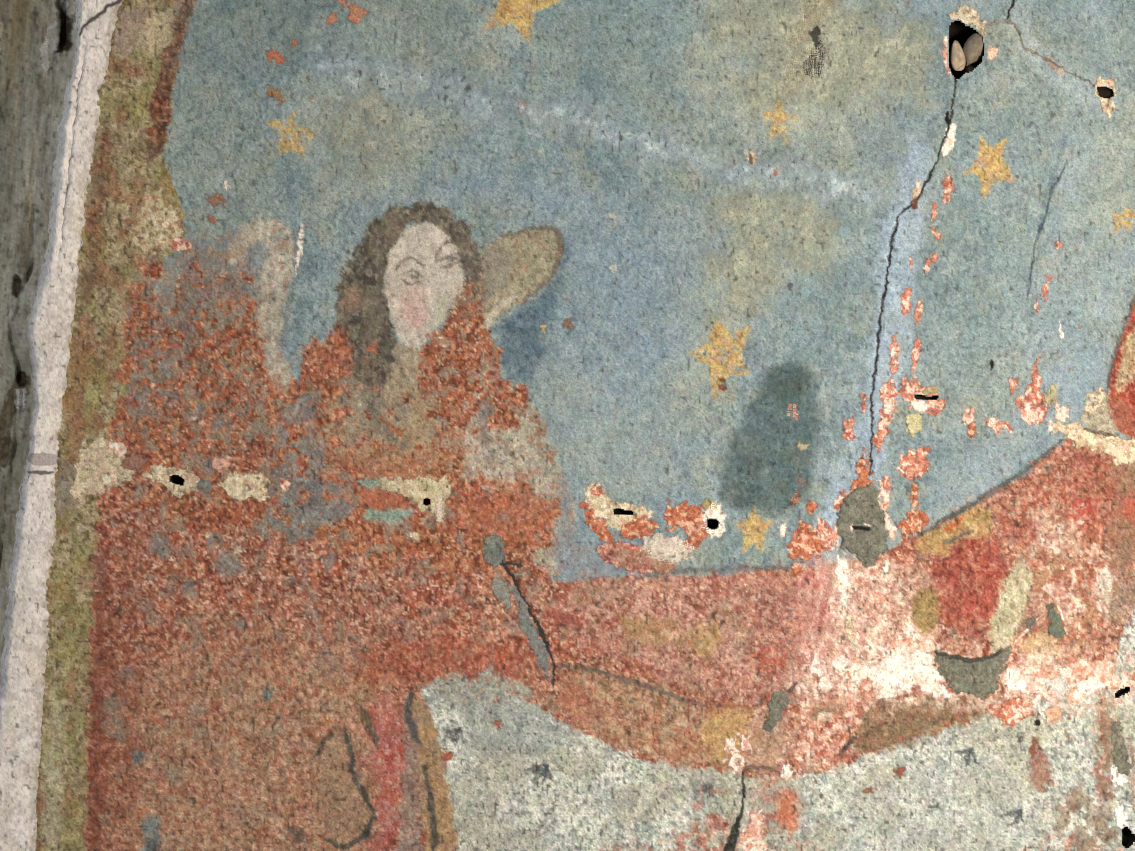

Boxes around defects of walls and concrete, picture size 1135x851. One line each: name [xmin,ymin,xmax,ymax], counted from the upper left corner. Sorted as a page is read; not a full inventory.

crack [978,0,1095,86]
crack [870,77,957,470]
peeling [909,174,954,275]
crack [1027,166,1065,297]
peeling [69,437,291,508]
peeling [380,475,451,522]
peeling [579,483,727,574]
water stain [721,367,817,508]
peeling [780,287,946,646]
crack [1084,428,1116,437]
crack [724,766,778,851]